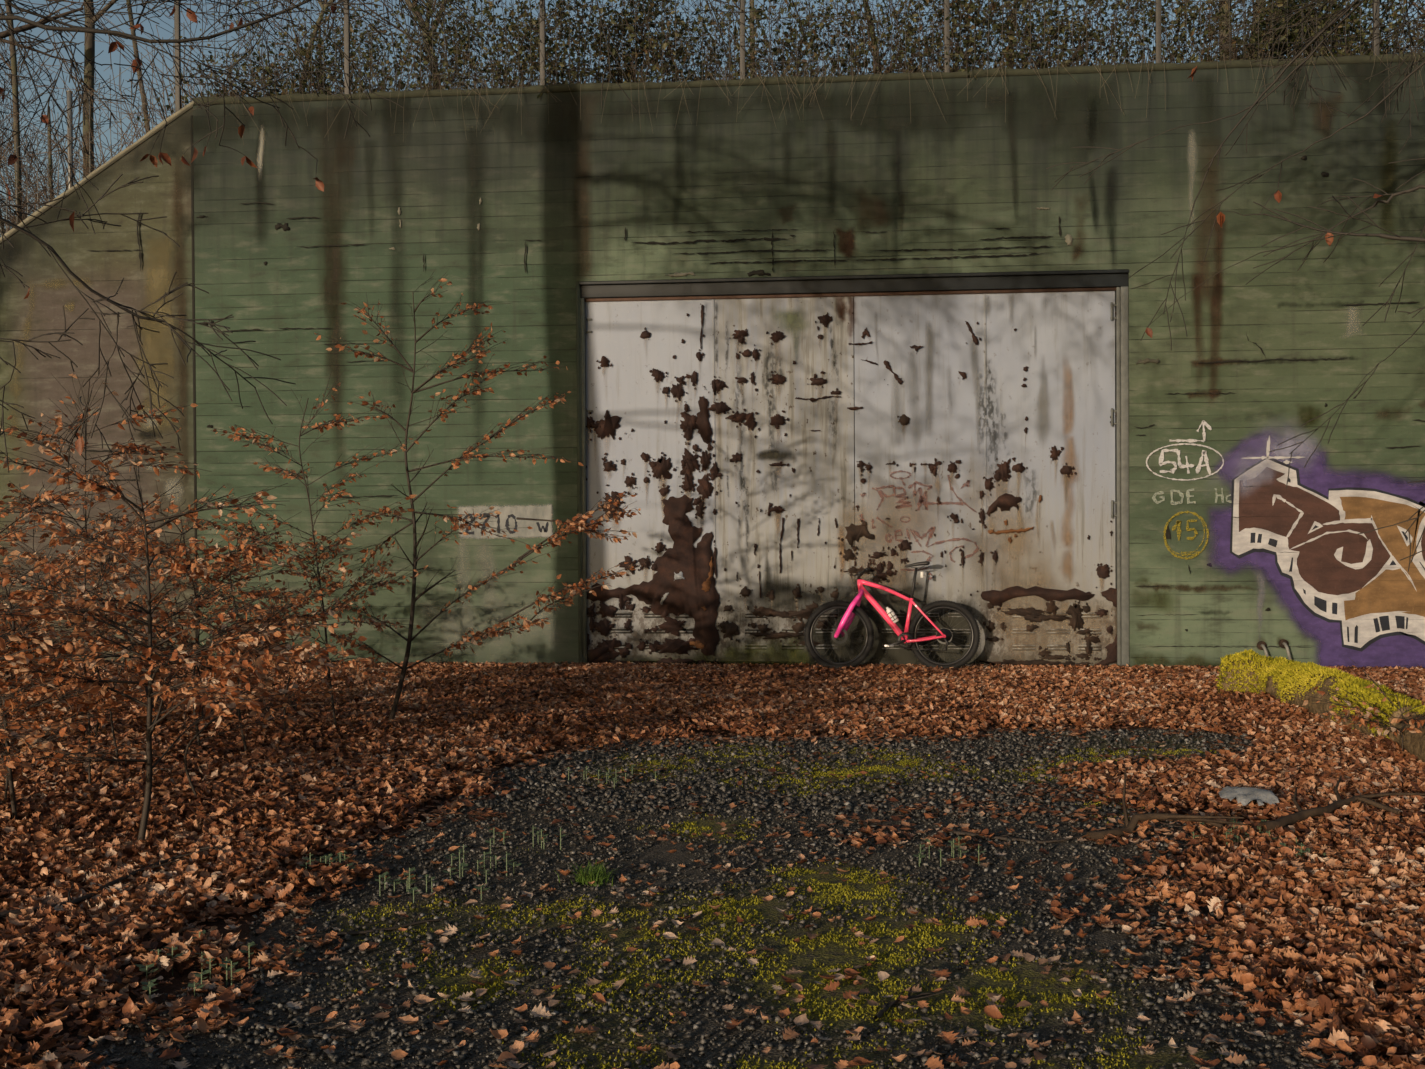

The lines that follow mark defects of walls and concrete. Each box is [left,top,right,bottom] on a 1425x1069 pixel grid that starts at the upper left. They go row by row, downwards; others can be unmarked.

damp [764,86,1107,227]
damp [182,98,438,430]
damp [458,93,737,404]
corrosion [836,297,854,336]
corrosion [990,505,1047,645]